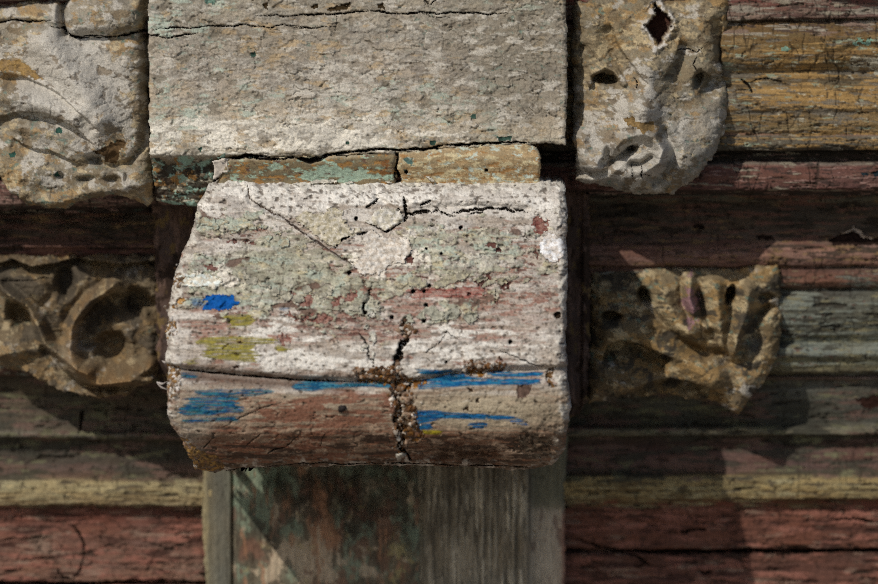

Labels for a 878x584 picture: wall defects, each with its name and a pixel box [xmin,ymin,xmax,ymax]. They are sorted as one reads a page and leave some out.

crack [0,0,507,39]
peeling [311,2,352,12]
crack [707,144,878,165]
crack [231,141,577,265]
peeling [531,216,566,262]
peeling [828,226,878,246]
peeling [179,262,222,289]
peeling [295,207,530,324]
peeling [242,270,379,358]
crack [176,367,347,382]
crack [226,326,526,471]
crack [203,402,282,448]